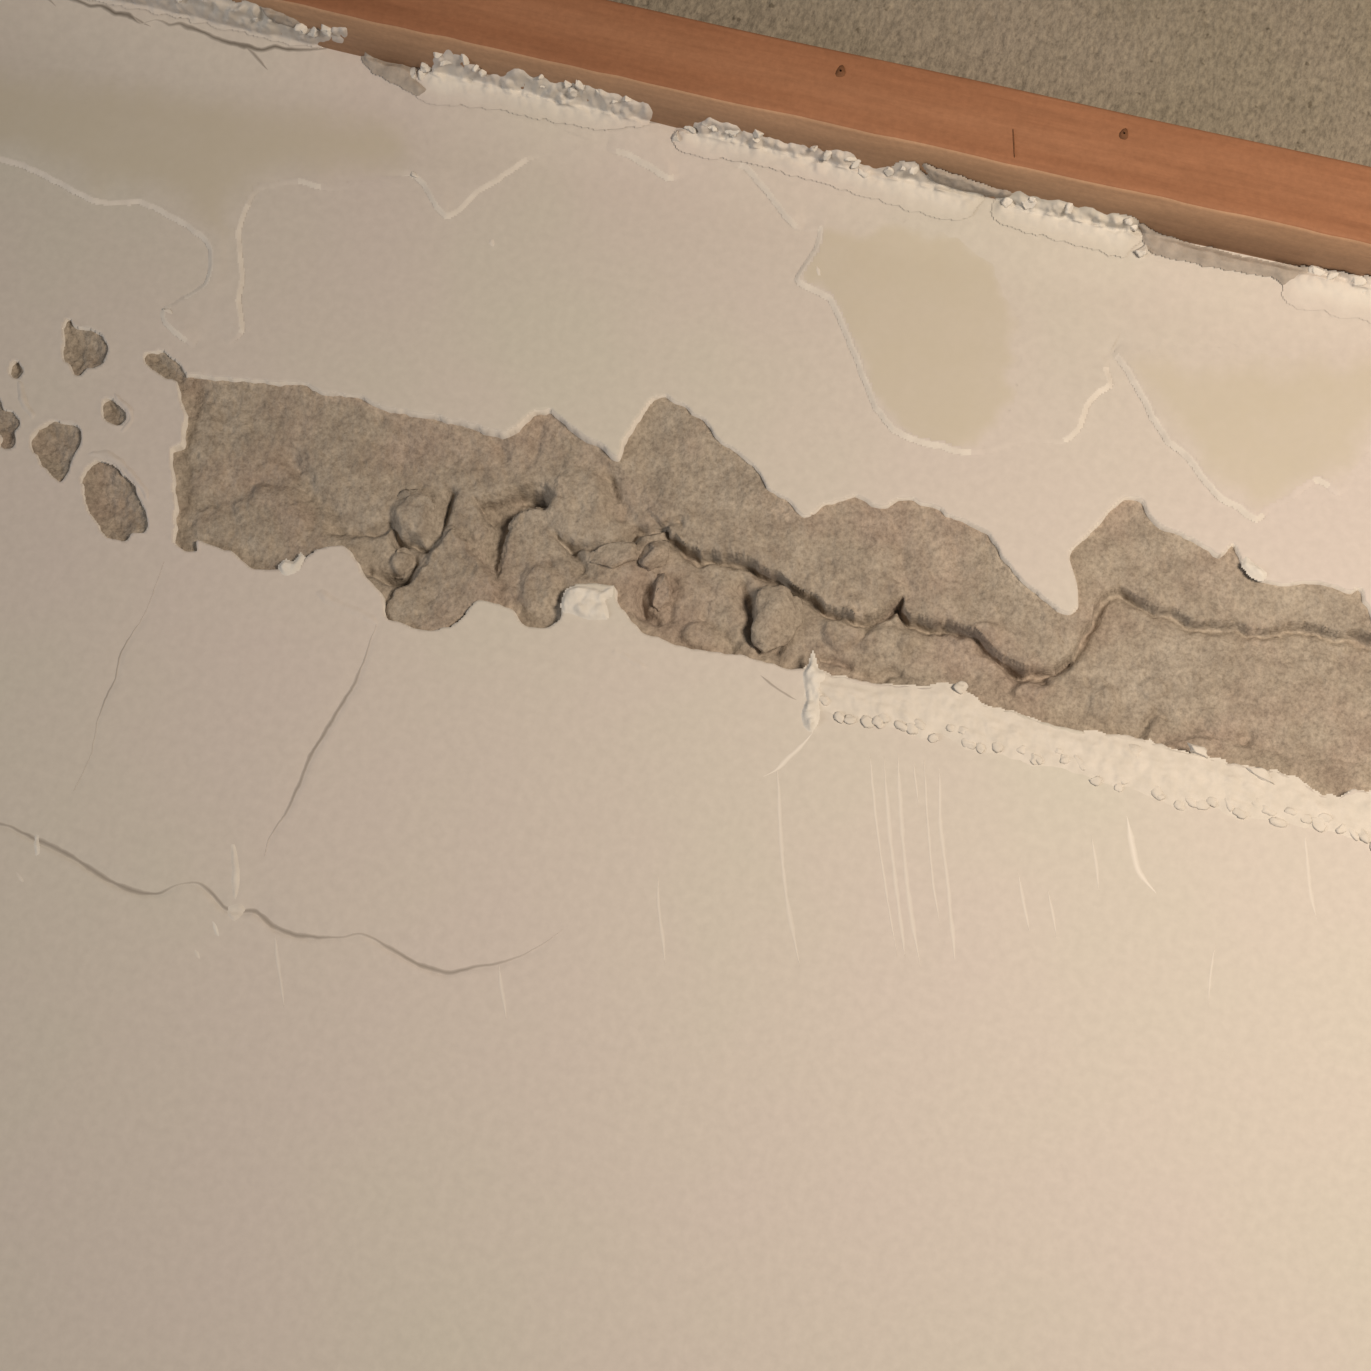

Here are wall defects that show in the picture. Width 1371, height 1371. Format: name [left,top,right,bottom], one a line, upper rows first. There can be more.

flaking render [90,0,348,47]
spalling [11,363,23,379]
spalling [0,400,148,541]
spalling [63,321,108,376]
peeling [361,50,1371,456]
crack [73,561,165,791]
flaking render [145,352,1371,849]
crack [0,626,559,975]